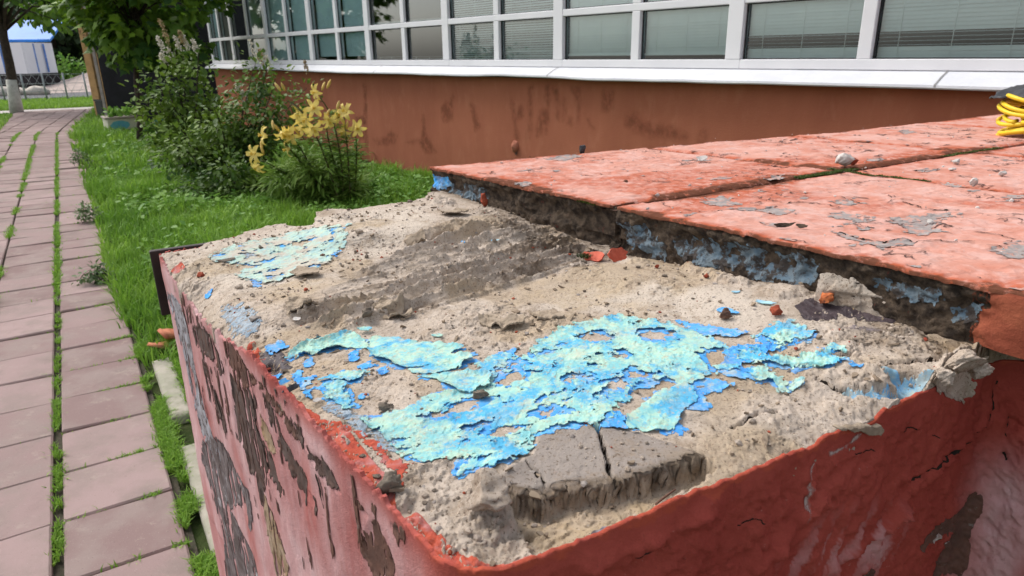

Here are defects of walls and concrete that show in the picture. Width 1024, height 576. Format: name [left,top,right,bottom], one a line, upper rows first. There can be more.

peeling [207,223,352,287]
spalling [403,228,427,246]
peeling [433,174,490,213]
peeling [616,138,819,285]
peeling [810,125,1024,268]
peeling [871,277,984,323]
flaking render [842,349,995,404]
peeling [167,291,864,576]
crack [599,430,617,489]
flaking render [832,422,884,436]
crack [905,381,1009,481]
peeling [920,492,983,576]